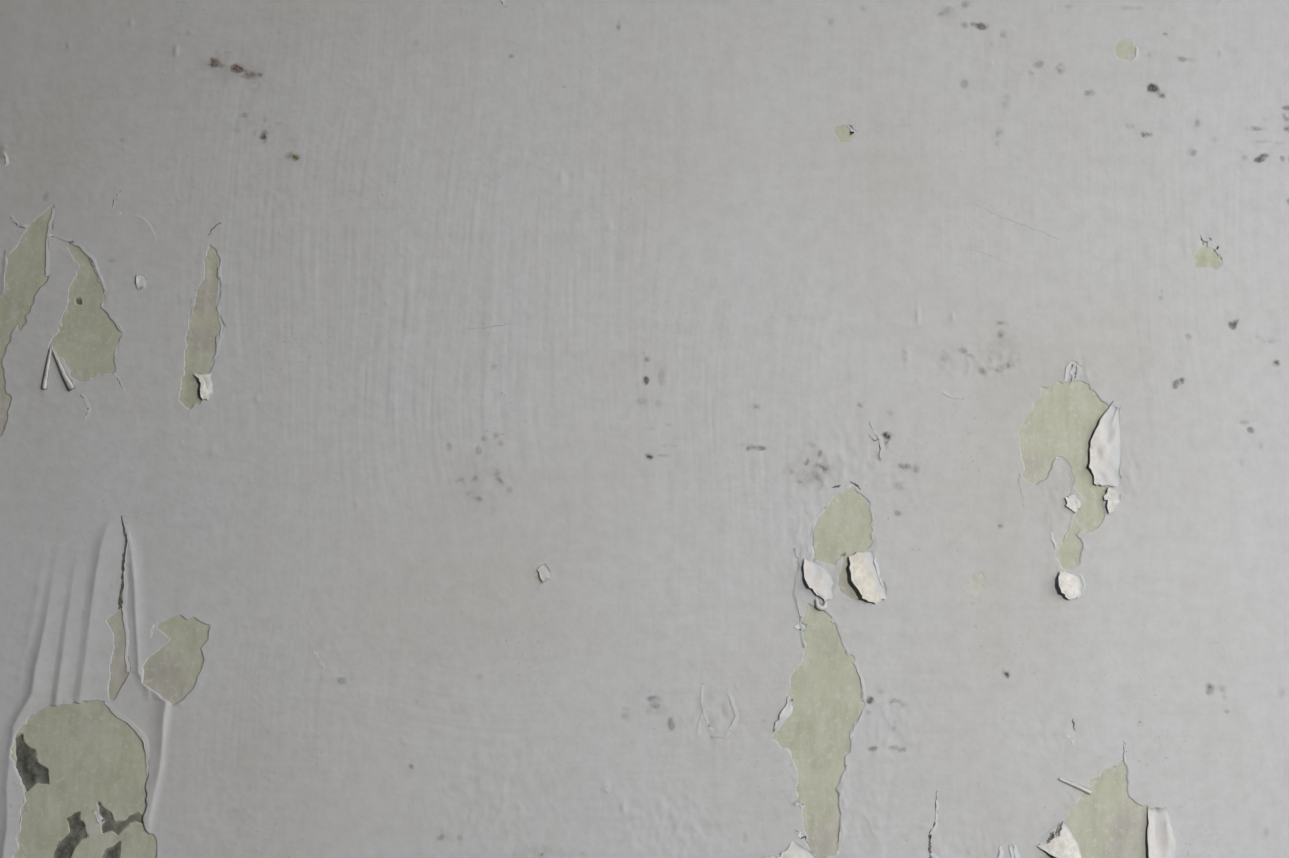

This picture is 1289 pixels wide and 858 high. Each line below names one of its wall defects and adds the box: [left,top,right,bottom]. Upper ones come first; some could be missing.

peeling [0,206,124,436]
peeling [179,245,225,409]
peeling [1017,361,1122,600]
peeling [11,608,209,858]
peeling [765,485,887,858]
peeling [1036,740,1176,858]